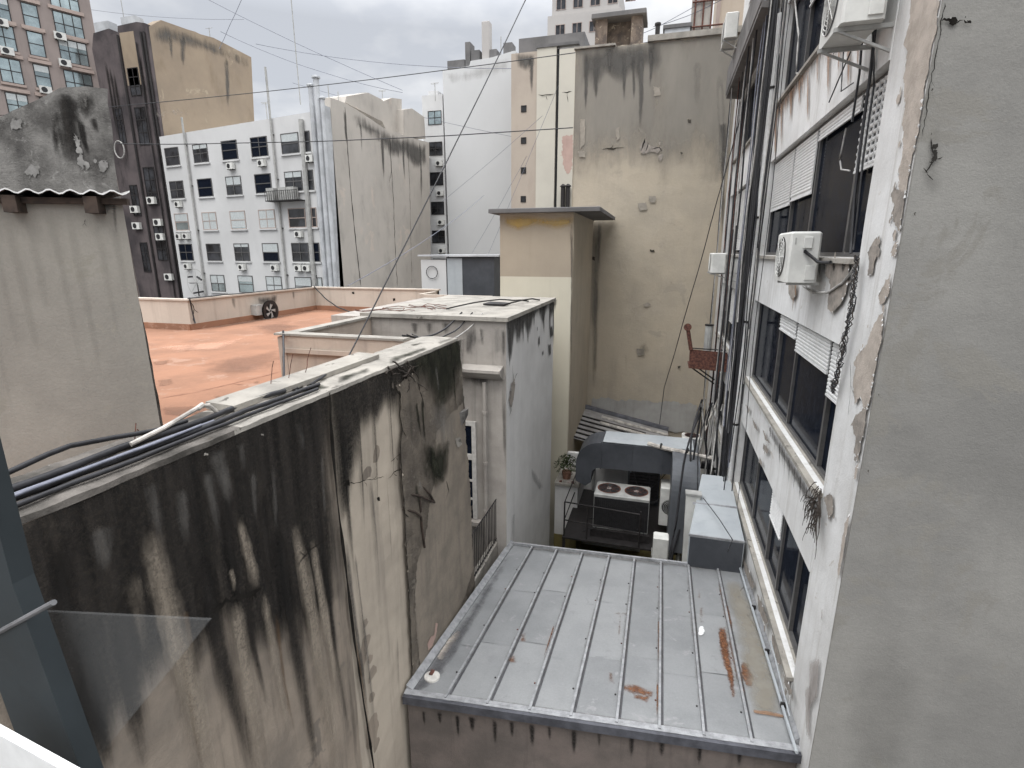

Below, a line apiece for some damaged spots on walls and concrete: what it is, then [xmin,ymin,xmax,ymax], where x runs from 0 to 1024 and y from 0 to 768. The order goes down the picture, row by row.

leakage [54,95,97,152]
spalling [74,135,108,172]
leakage [359,123,425,184]
leakage [574,34,740,217]
peeling [867,0,971,276]
leakage [503,301,556,360]
peeling [851,274,891,461]
leakage [22,332,474,754]
peeling [824,494,850,576]
rust [719,589,754,696]
rust [624,685,658,709]